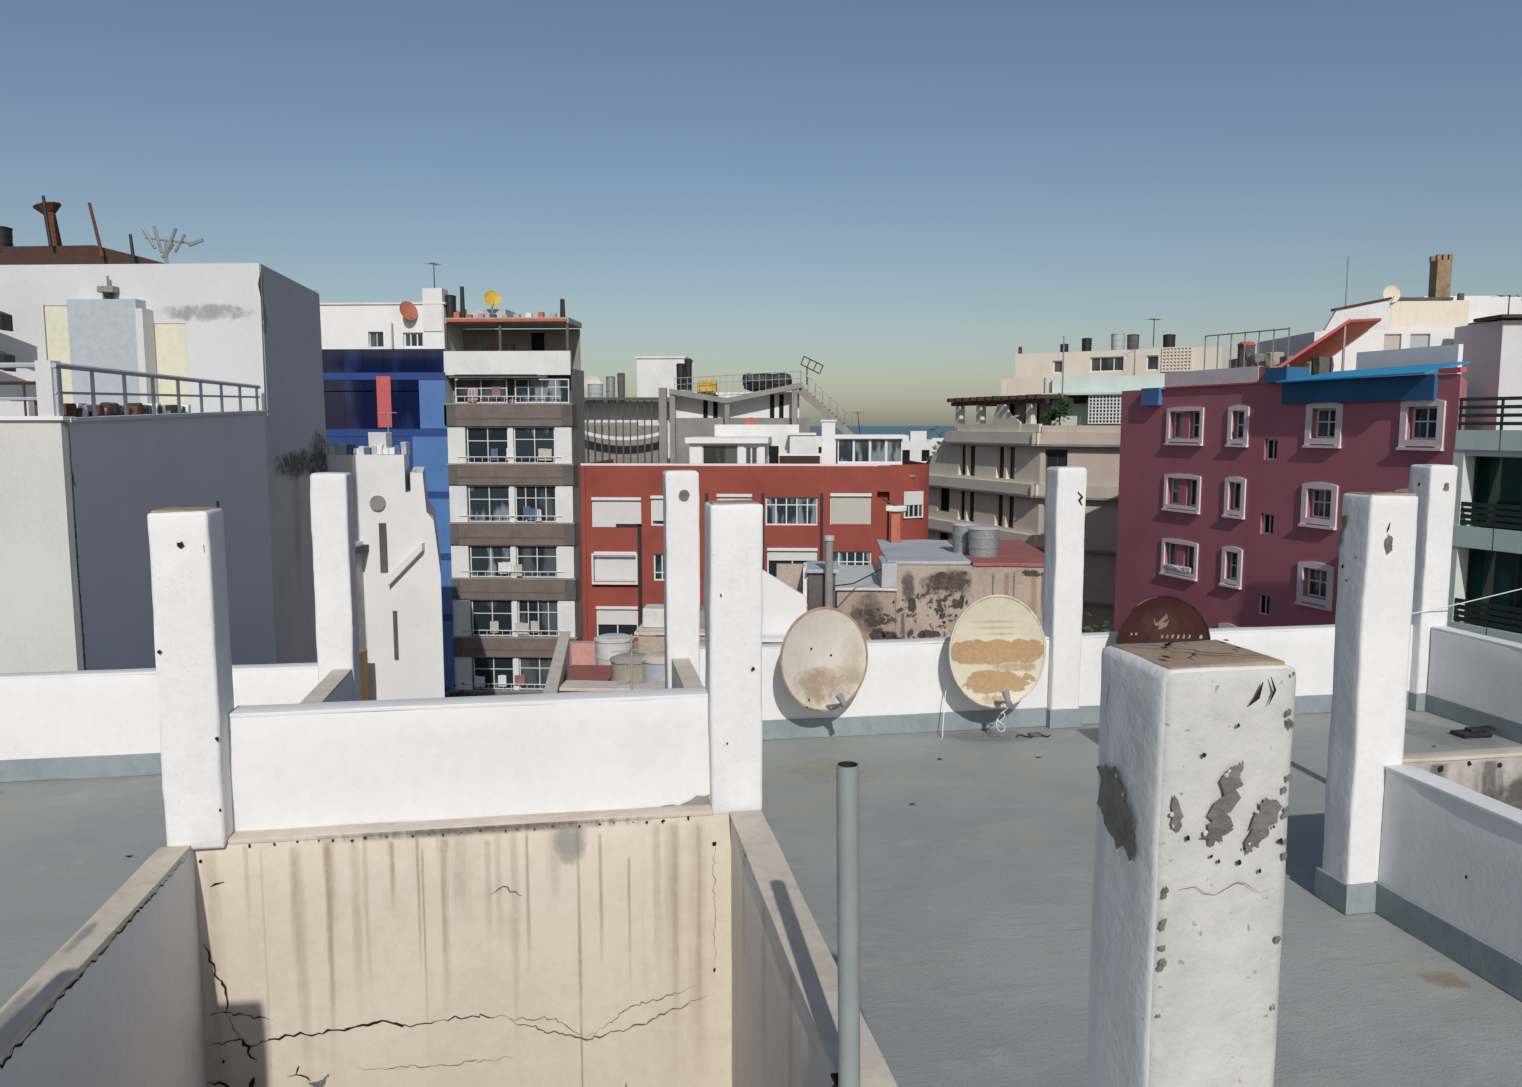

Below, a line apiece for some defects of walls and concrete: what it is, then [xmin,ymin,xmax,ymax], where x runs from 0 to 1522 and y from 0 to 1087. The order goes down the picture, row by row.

leakage [276,433,327,478]
leakage [415,821,580,855]
peeling [1096,763,1135,861]
peeling [1170,761,1293,865]
leakage [1483,762,1522,809]
crack [0,858,186,1069]
crack [203,943,706,1087]